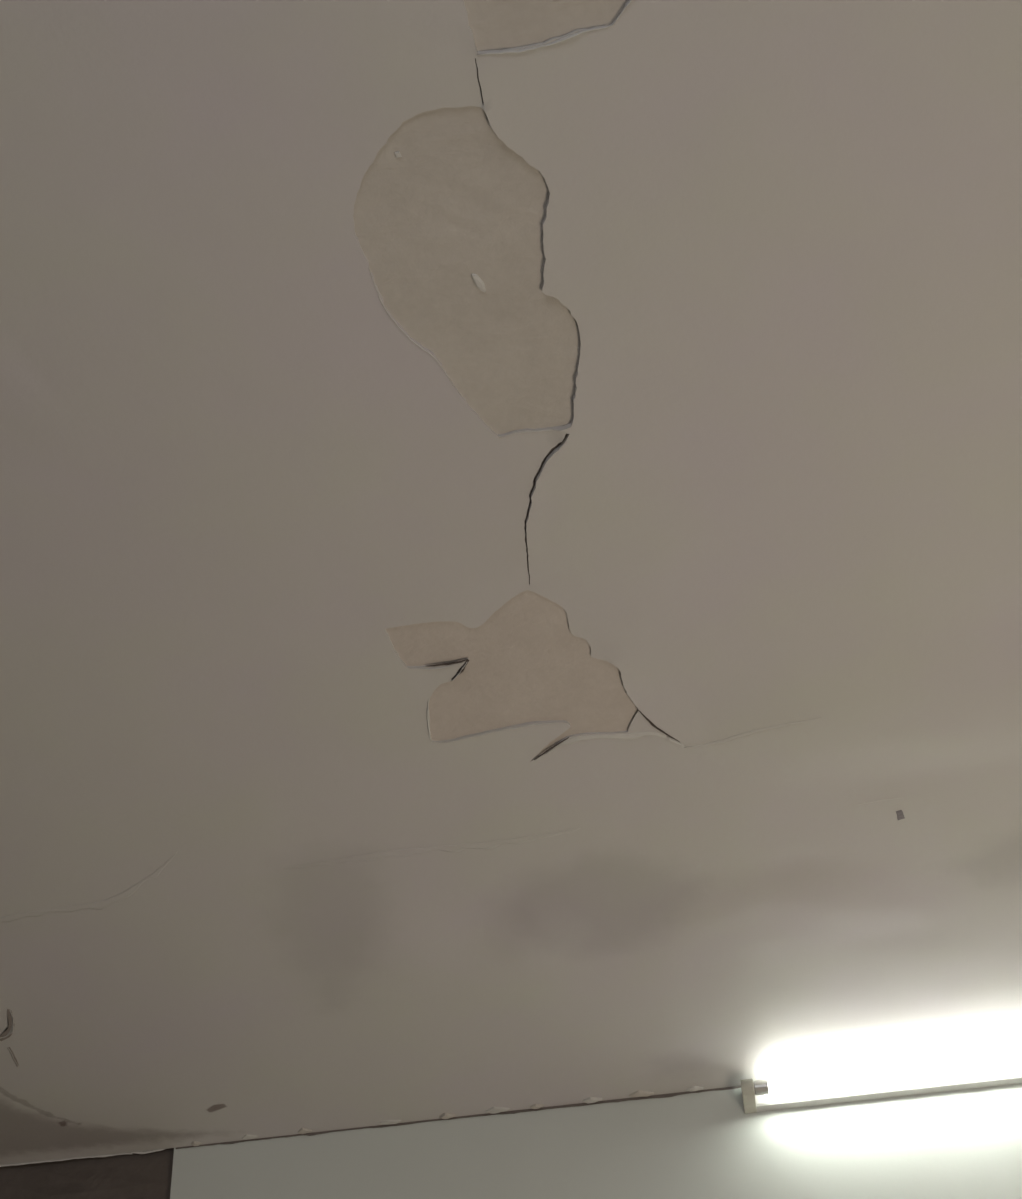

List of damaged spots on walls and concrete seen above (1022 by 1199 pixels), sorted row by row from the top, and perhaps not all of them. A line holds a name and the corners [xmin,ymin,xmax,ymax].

crack [524,434,567,584]
peeling [386,590,683,760]